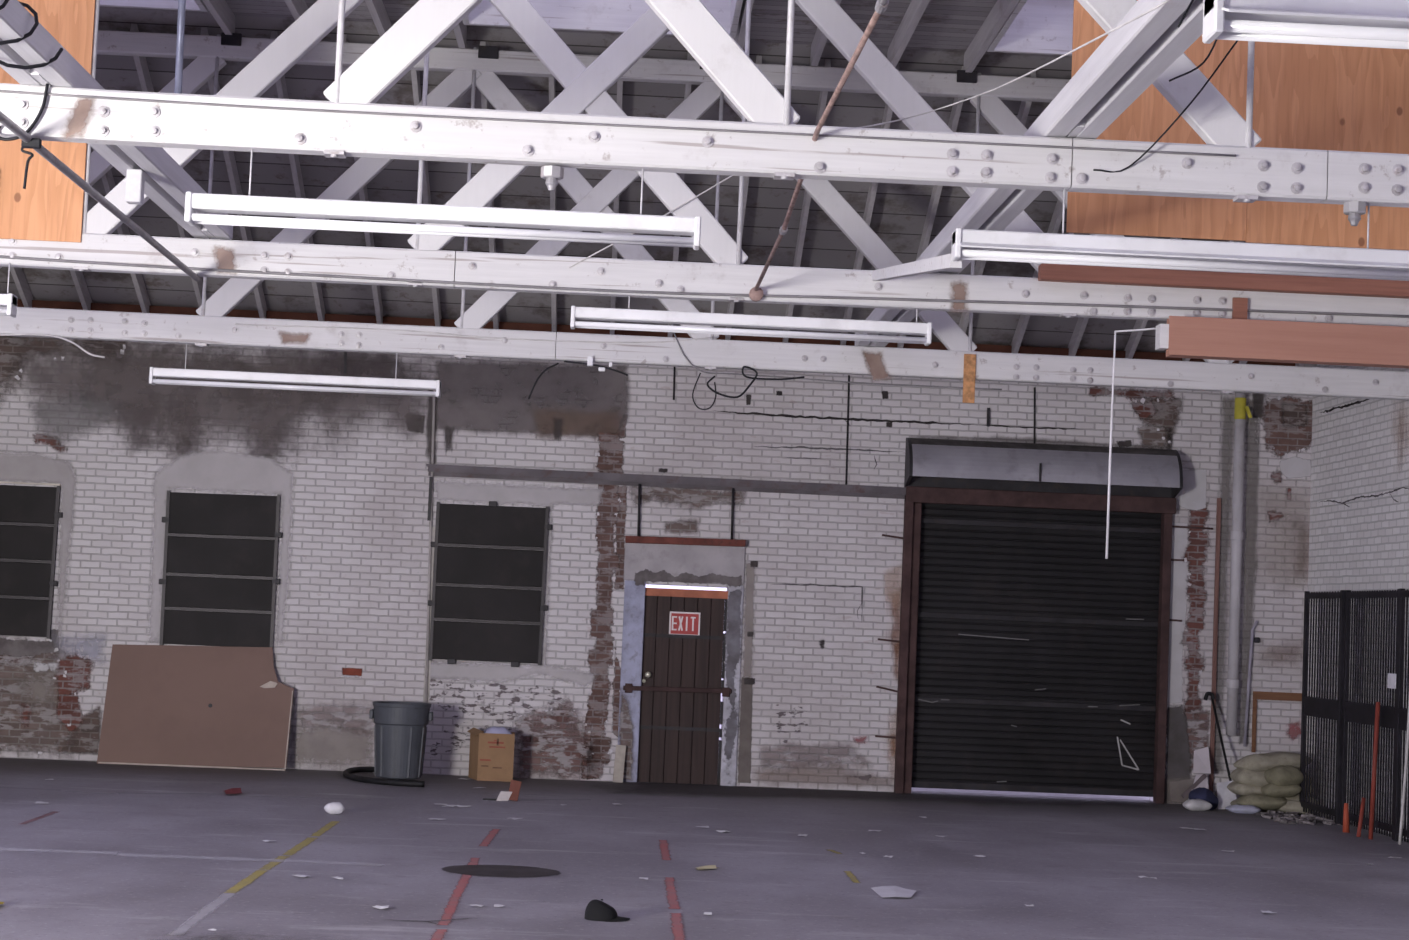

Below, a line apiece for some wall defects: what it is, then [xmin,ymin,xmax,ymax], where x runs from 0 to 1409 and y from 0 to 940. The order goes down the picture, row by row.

flaking render [33,434,65,452]
peeling [0,336,129,393]
damp [280,333,309,343]
damp [407,361,628,464]
peeling [1089,386,1182,450]
peeling [1253,393,1313,522]
crack [1321,487,1409,507]
flaking render [430,415,758,783]
flaking render [1182,502,1210,771]
peeling [0,629,101,755]